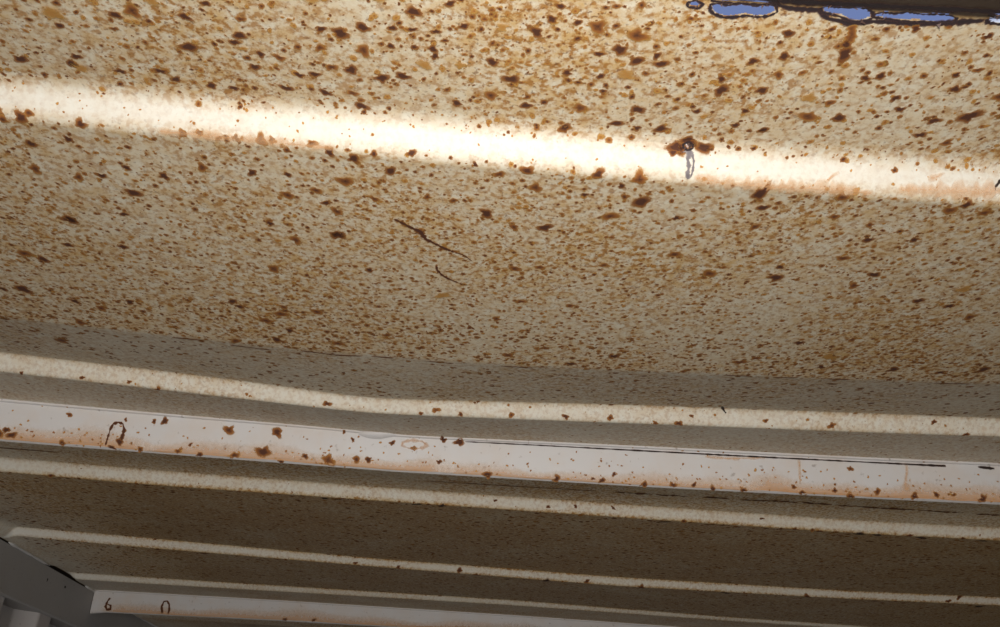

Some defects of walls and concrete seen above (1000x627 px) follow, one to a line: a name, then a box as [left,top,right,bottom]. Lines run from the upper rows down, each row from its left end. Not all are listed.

rust [315,22,371,52]
rust [611,27,670,79]
rust [741,0,1000,64]
rust [308,64,358,96]
rust [754,51,790,95]
rust [797,93,846,122]
rust [912,109,986,138]
rust [664,135,714,157]
rust [519,166,543,193]
rust [618,167,652,208]
rust [750,181,772,210]
crack [394,219,472,286]